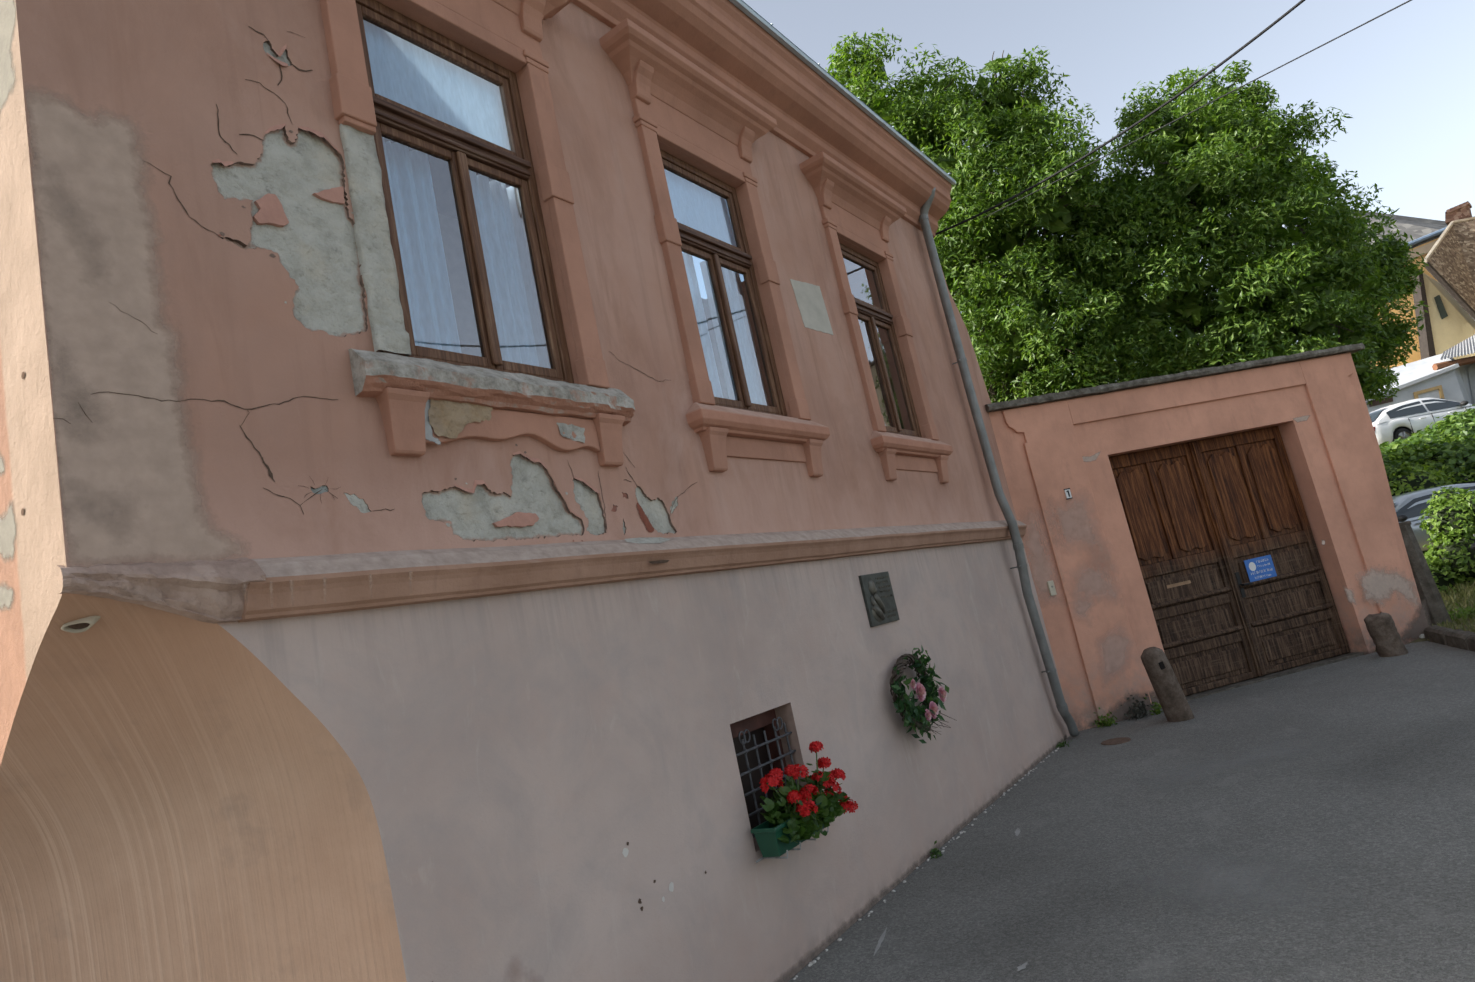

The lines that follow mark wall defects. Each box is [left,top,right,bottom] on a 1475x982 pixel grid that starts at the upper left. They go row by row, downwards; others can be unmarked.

crack [142,160,220,237]
flaking render [211,123,411,357]
crack [53,391,338,515]
flaking render [425,399,493,445]
flaking render [422,444,697,564]
flaking render [557,423,585,443]